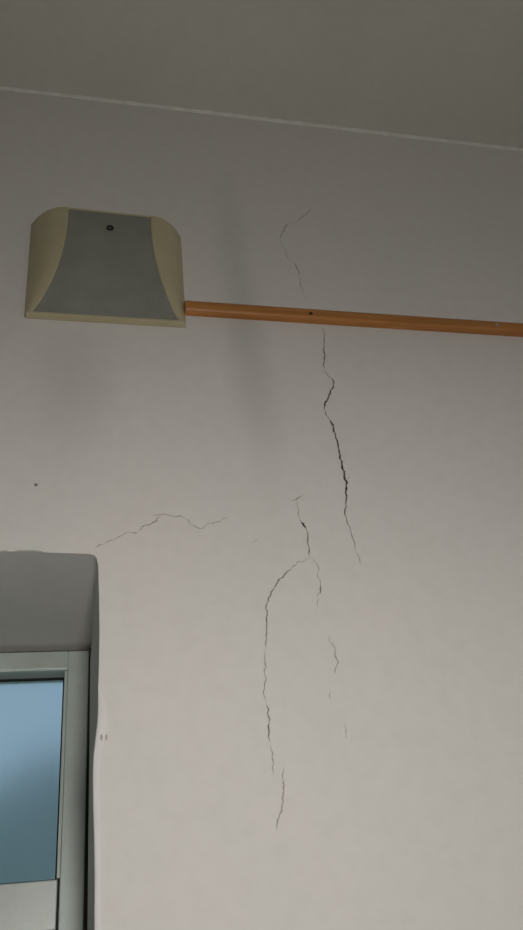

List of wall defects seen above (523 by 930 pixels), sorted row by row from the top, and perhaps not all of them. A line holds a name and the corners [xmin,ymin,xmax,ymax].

crack [323,331,355,543]
crack [265,570,290,636]